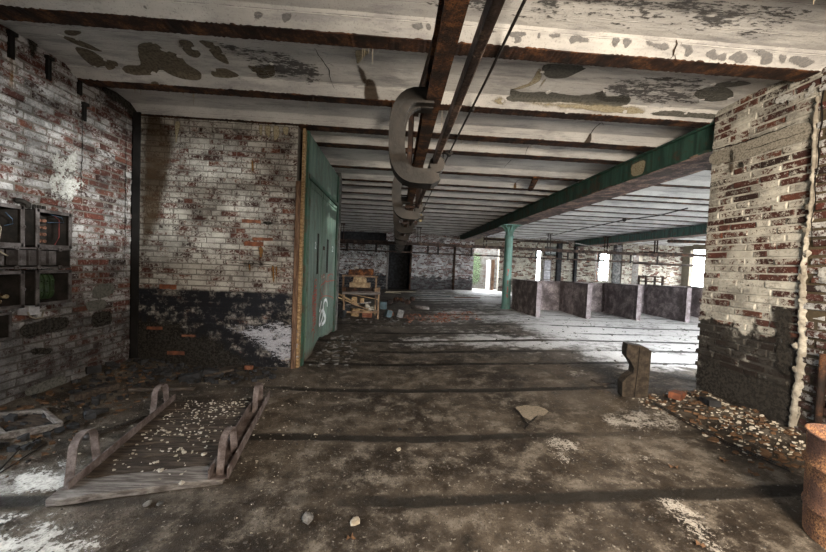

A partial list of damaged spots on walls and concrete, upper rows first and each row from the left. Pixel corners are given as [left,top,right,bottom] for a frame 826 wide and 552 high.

peeling [57,30,239,85]
peeling [248,62,275,79]
peeling [540,64,589,79]
peeling [500,89,631,114]
peeling [650,110,716,119]
water stain [141,116,180,240]